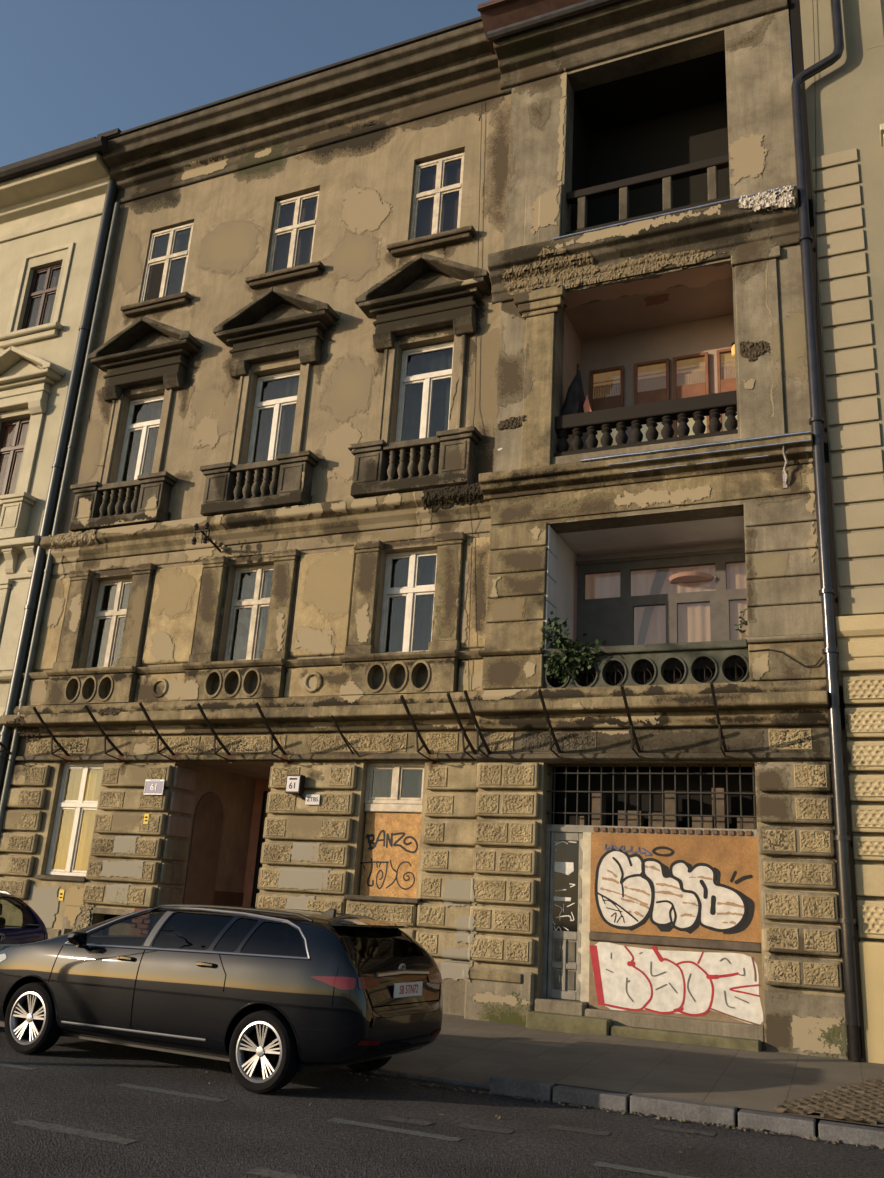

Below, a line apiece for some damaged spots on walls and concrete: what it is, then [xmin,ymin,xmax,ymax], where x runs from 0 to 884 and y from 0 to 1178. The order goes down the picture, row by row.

peeling [181,155,229,180]
peeling [729,134,795,212]
spalling [499,204,725,295]
peeling [461,279,492,305]
spalling [740,340,769,361]
water stain [15,24,837,887]
peeling [614,485,711,508]
peeling [276,612,335,658]